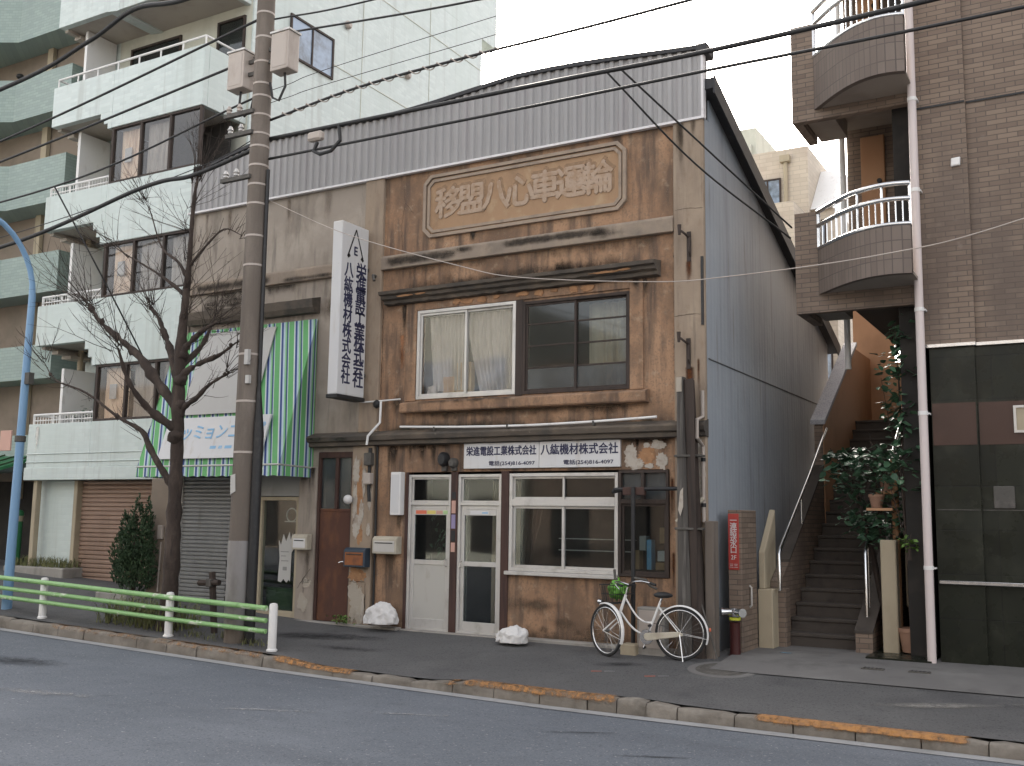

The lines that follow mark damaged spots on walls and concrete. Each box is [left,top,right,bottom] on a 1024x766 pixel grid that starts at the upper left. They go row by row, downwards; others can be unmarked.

flaking render [624,439,668,470]
flaking render [352,456,372,545]